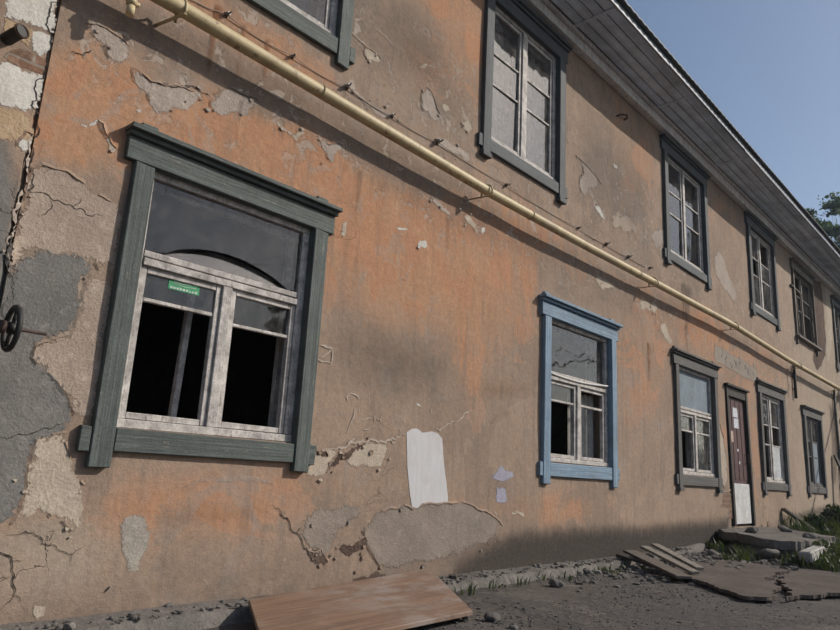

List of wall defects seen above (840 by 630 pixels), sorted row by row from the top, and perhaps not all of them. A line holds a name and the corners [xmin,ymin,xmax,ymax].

crack [7,0,105,257]
spalling [86,21,260,116]
spalling [269,90,285,100]
spalling [319,138,345,164]
spalling [420,86,450,121]
spalling [9,430,87,538]
spalling [307,437,391,482]
crack [13,531,81,557]
spalling [120,514,150,572]
crack [272,504,319,564]
spalling [306,500,503,581]
crack [0,552,21,605]